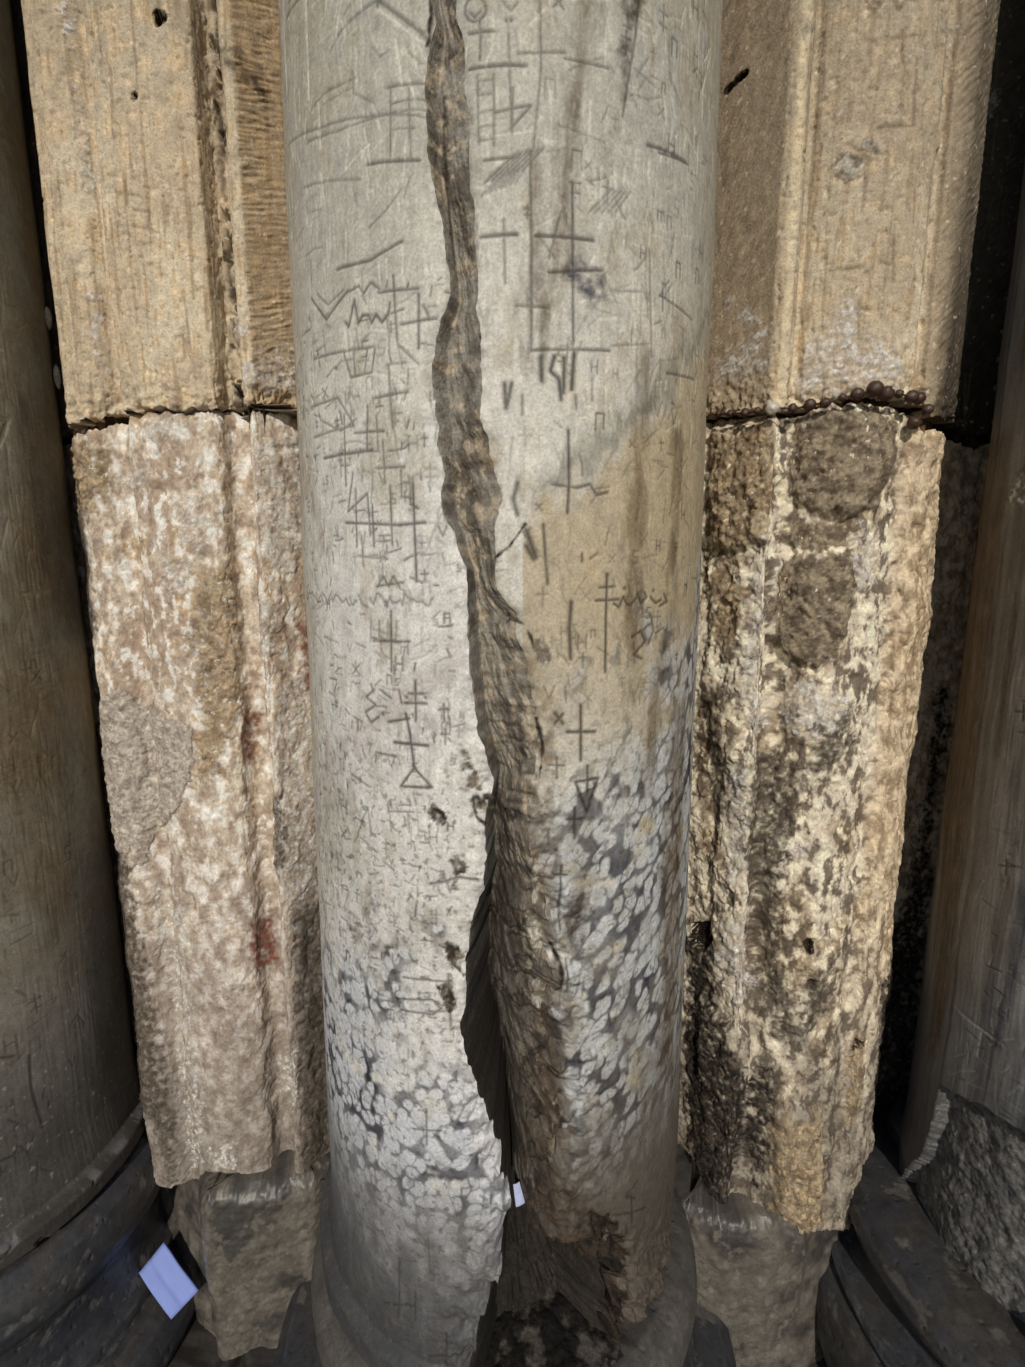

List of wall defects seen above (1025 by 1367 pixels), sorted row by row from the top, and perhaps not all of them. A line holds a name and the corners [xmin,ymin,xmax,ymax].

crack [62,391,268,446]
crack [706,398,991,451]
crack [425,0,621,1367]
water stain [702,688,725,813]
water stain [872,446,1002,1131]
peeling [526,911,548,958]
peeling [531,978,545,1008]
water stain [664,896,777,1205]
water stain [743,721,848,1041]
spalling [901,1084,1025,1323]
spalling [483,1211,629,1367]